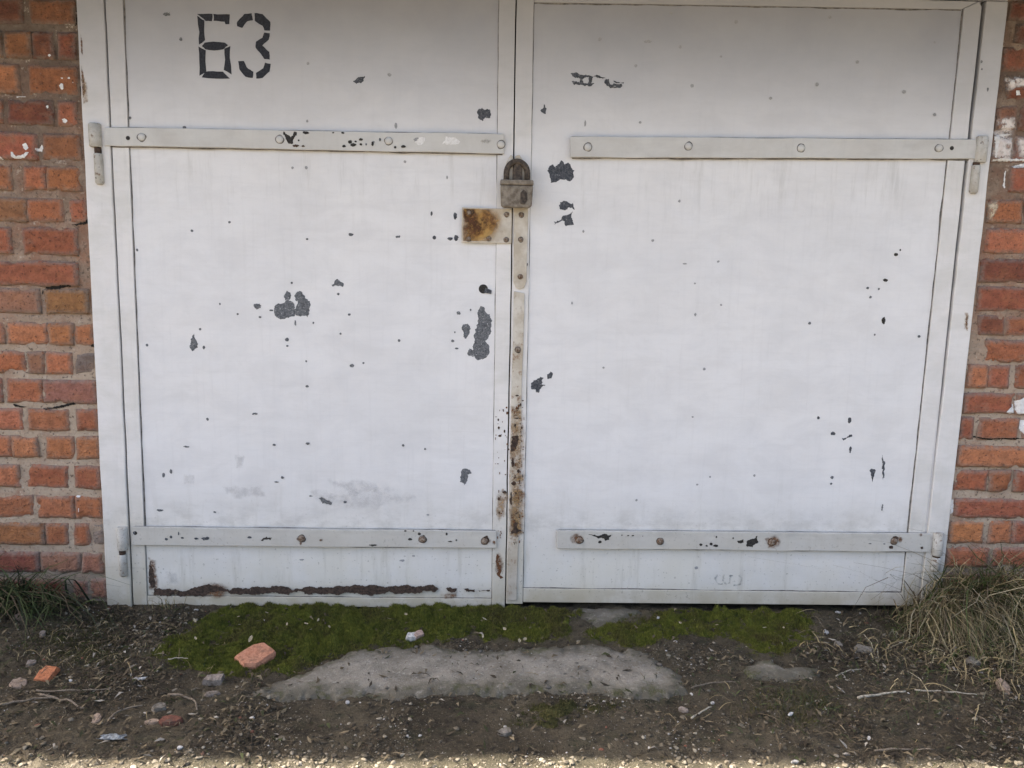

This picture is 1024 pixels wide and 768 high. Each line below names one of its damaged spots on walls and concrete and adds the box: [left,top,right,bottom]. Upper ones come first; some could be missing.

peeling [283,131,309,147]
peeling [547,160,574,183]
corrosion [463,209,499,241]
peeling [555,201,575,226]
peeling [254,282,314,326]
peeling [451,306,492,360]
peeling [531,372,553,393]
corrosion [483,395,524,579]
corrosion [149,561,490,598]